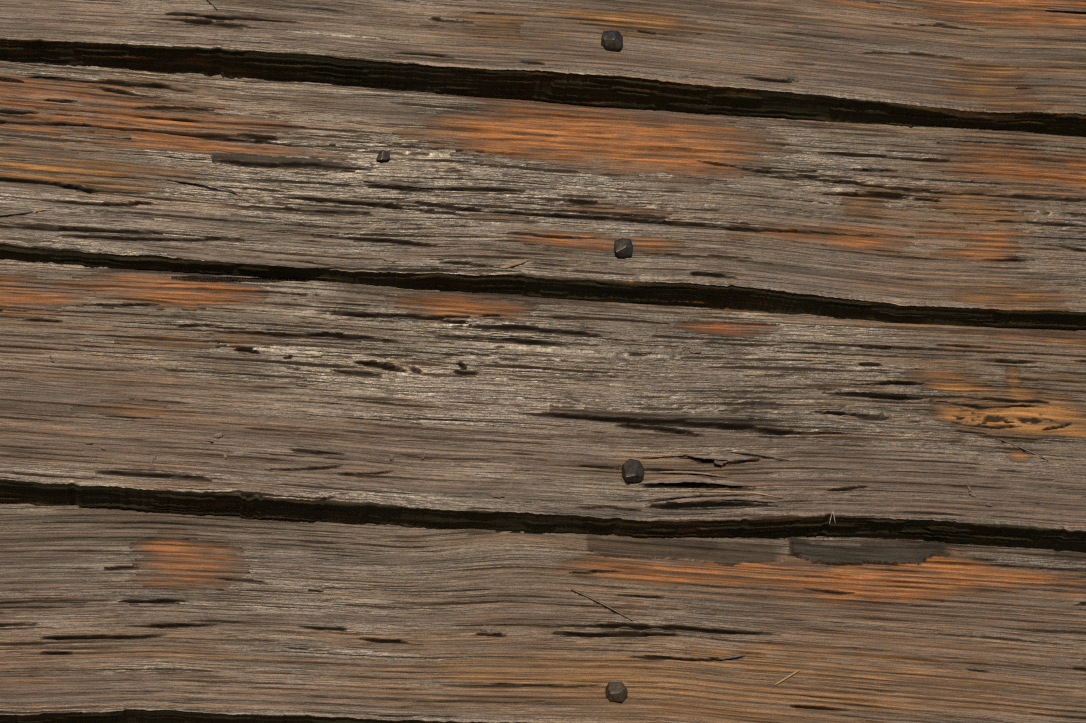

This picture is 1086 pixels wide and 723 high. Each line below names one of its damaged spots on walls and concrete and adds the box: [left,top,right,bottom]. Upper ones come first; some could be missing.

crack [163,12,304,30]
crack [507,344,1074,512]
crack [547,569,782,663]